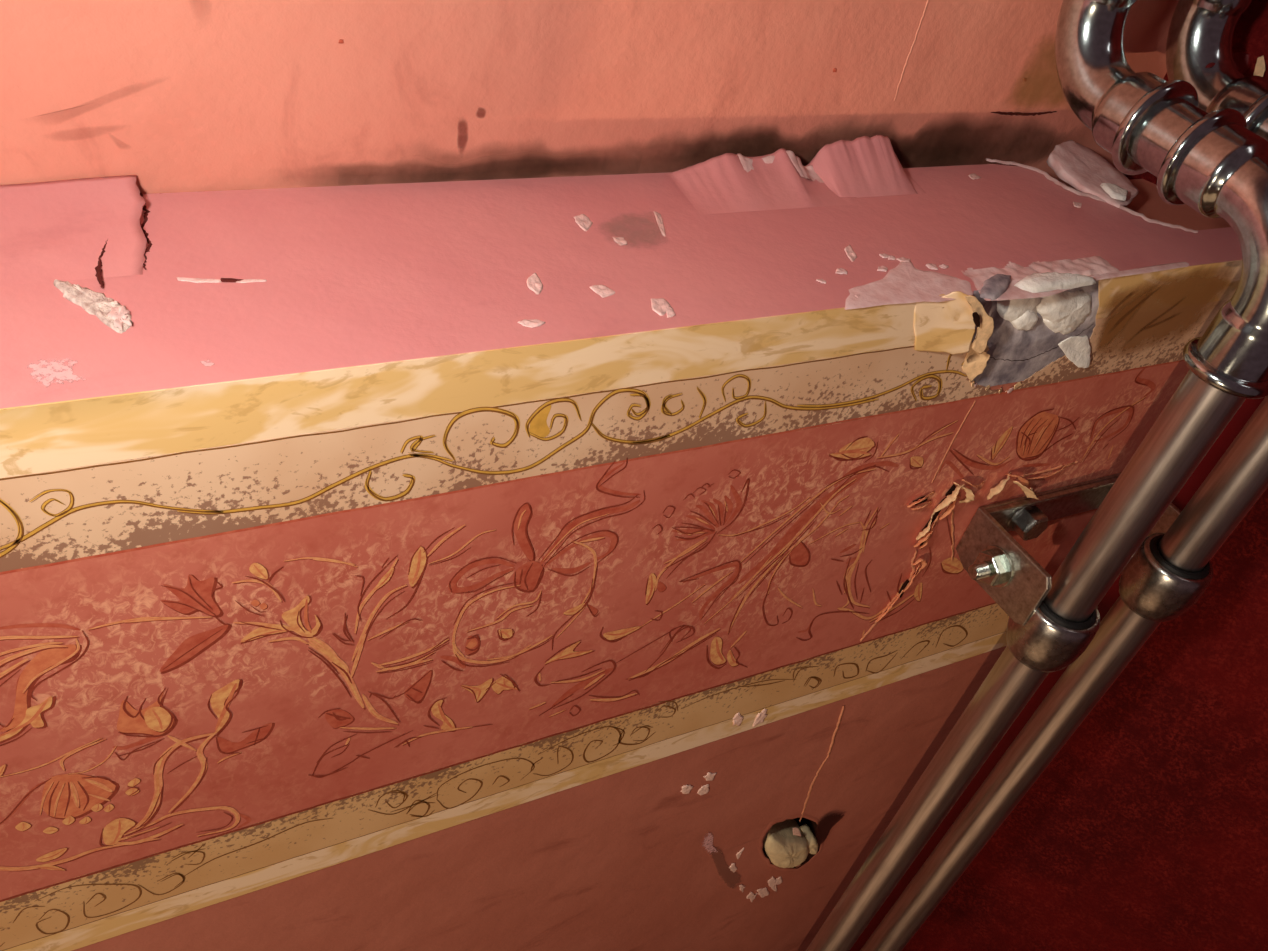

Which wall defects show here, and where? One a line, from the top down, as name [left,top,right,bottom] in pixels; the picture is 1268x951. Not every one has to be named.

leakage [739,138,780,157]
peeling [666,148,863,215]
spalling [1047,140,1139,208]
peeling [0,175,152,334]
crack [95,240,108,288]
peeling [816,245,857,284]
spalling [845,253,1189,387]
spalling [730,813,824,902]